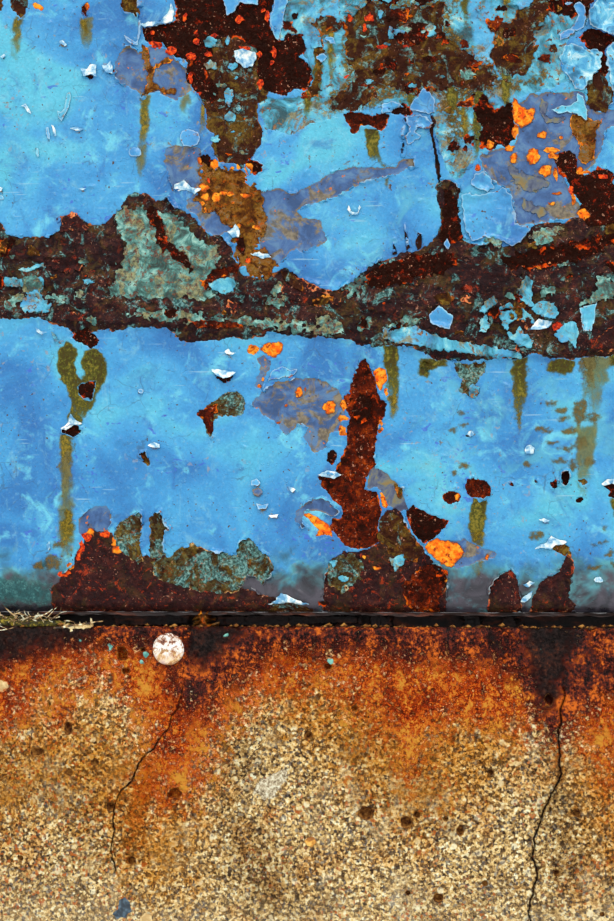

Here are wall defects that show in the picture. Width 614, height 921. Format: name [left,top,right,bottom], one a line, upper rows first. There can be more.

peeling [80,44,192,100]
peeling [259,0,614,246]
peeling [163,143,231,236]
peeling [259,155,423,265]
rust [0,0,614,613]
peeling [211,369,236,383]
peeling [247,341,345,453]
peeling [295,495,342,531]
peeling [535,536,568,550]
crack [110,685,183,872]
rust [0,626,614,824]
crack [528,687,565,921]